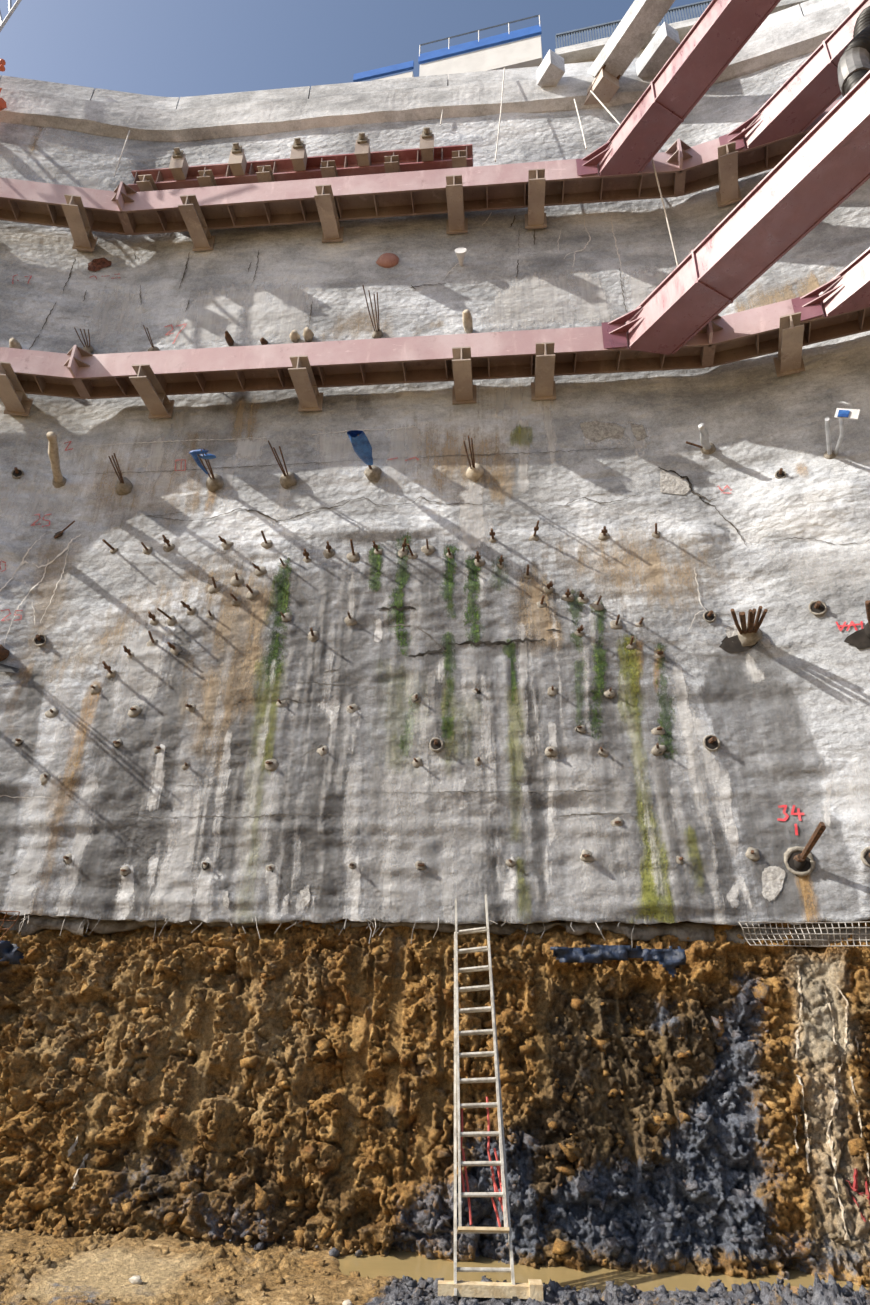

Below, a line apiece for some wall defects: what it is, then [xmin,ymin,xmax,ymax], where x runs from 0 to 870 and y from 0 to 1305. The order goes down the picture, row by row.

crack [141,496,492,522]
crack [540,467,869,546]
crack [377,606,560,658]
damp [58,776,96,916]
damp [117,856,159,920]
damp [148,707,169,811]
damp [195,835,223,922]
damp [266,749,361,921]
damp [493,857,520,923]
damp [512,693,557,893]
damp [674,666,808,915]
rust [798,876,815,922]